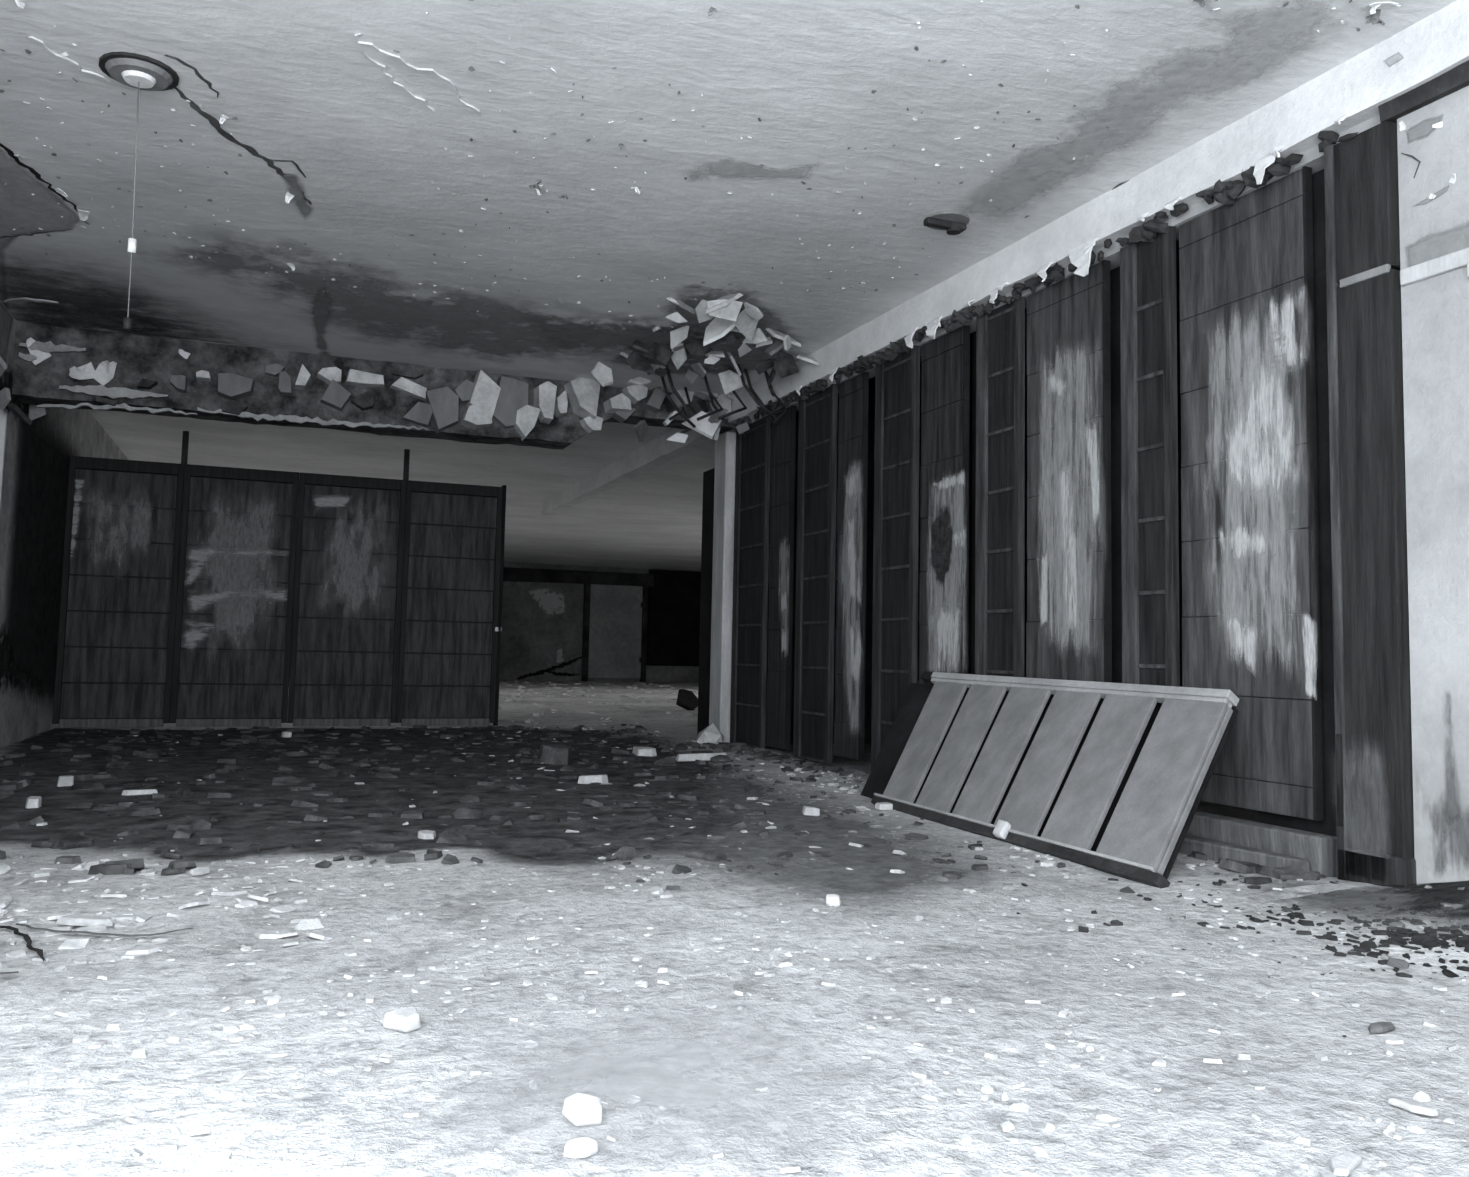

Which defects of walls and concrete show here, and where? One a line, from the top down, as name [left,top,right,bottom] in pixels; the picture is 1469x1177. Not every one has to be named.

peeling [1363,1,1401,26]
crack [164,55,312,217]
peeling [972,0,1325,216]
peeling [1399,117,1443,143]
peeling [1415,173,1456,206]
peeling [1407,224,1469,267]
spalling [0,113,1358,441]
crack [0,923,193,974]